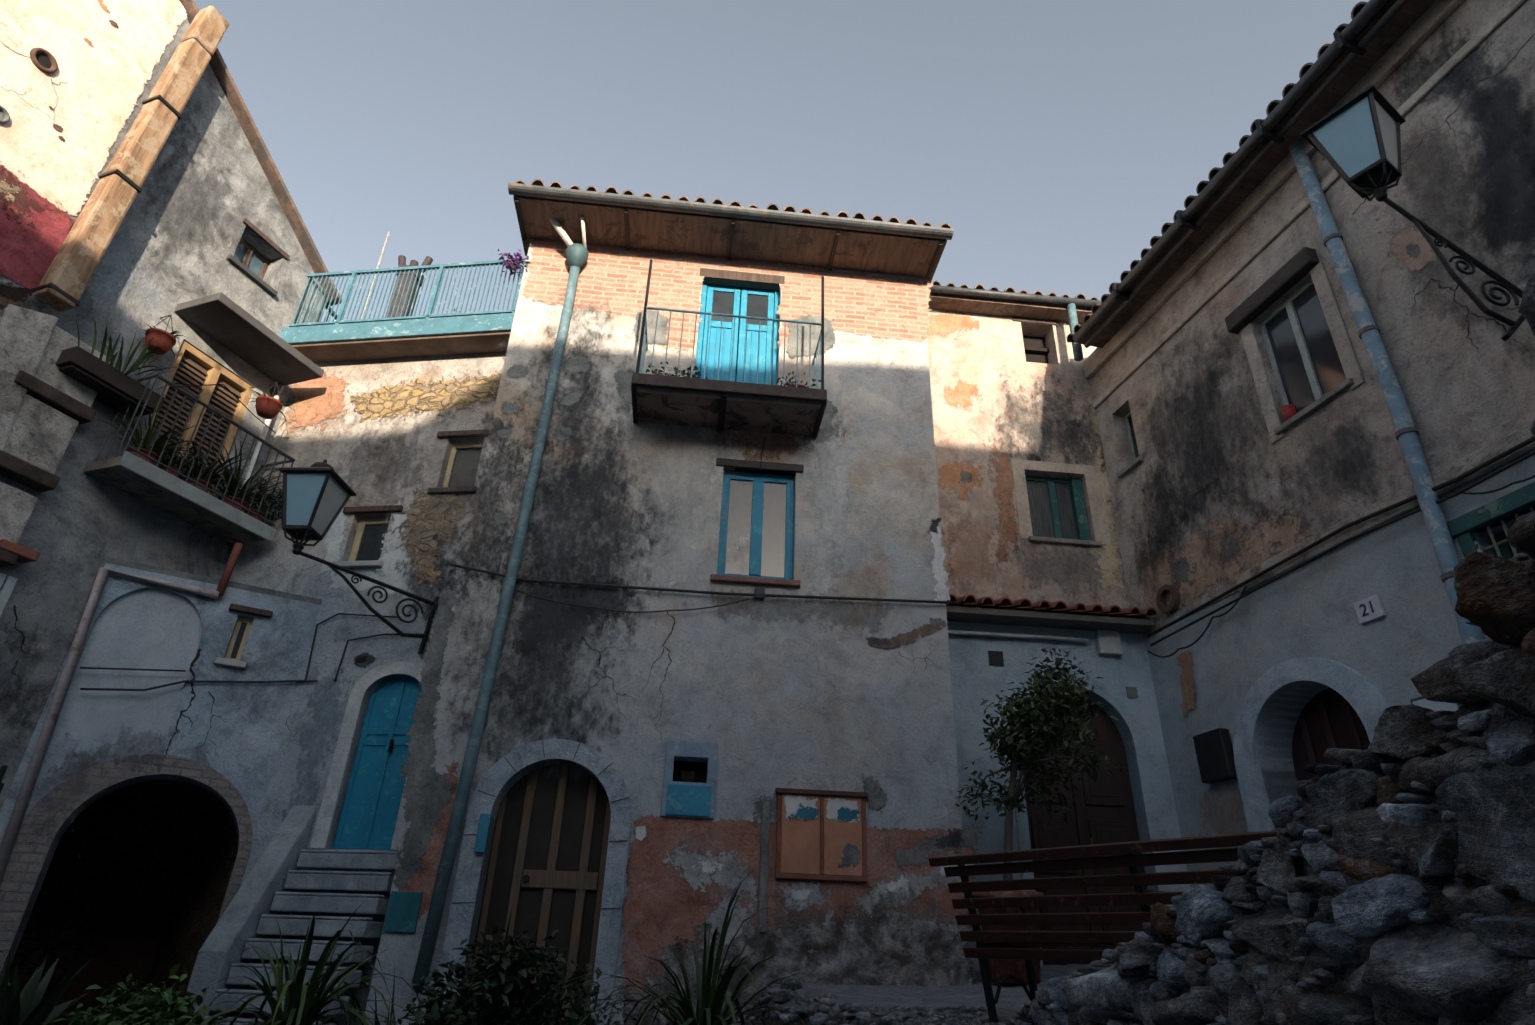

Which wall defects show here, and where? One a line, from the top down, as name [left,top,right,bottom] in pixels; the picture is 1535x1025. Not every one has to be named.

spalling [30,47,58,74]
spalling [0,105,10,124]
peeling [0,161,62,233]
water stain [1391,22,1535,352]
spalling [0,283,36,307]
flaking render [938,458,985,500]
water stain [1135,333,1267,583]
water stain [395,305,674,762]
crack [166,648,221,758]
peeling [655,838,759,944]
peeling [780,880,834,916]
peeling [853,821,983,919]